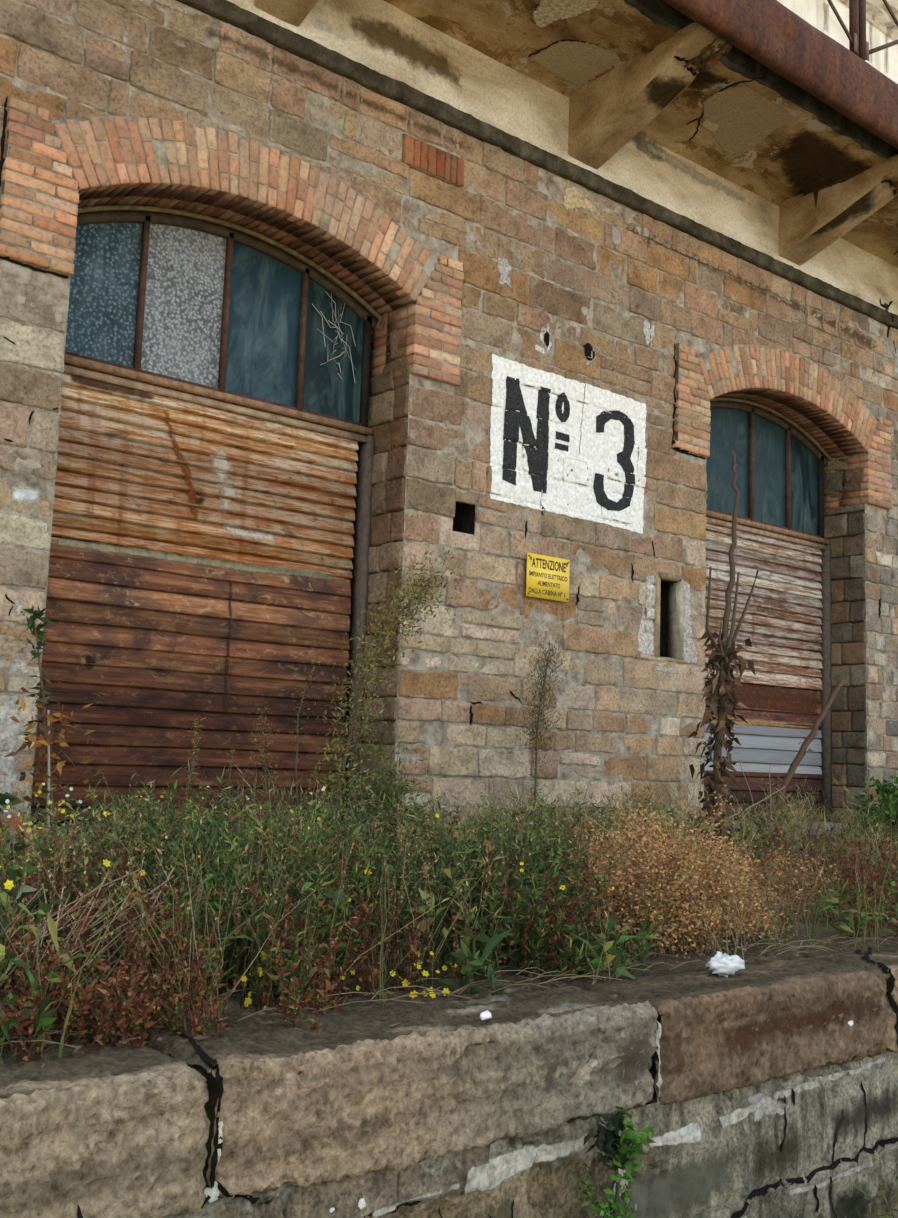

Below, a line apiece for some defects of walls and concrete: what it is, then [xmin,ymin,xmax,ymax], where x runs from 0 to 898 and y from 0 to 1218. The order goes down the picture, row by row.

peeling [531,0,599,28]
damp [327,19,459,83]
peeling [528,39,621,109]
damp [646,70,726,108]
damp [632,133,742,199]
damp [776,132,872,207]
damp [810,189,873,236]
crack [855,947,898,1044]
crack [167,1027,260,1209]
crack [731,1081,898,1218]
crack [364,1200,443,1218]